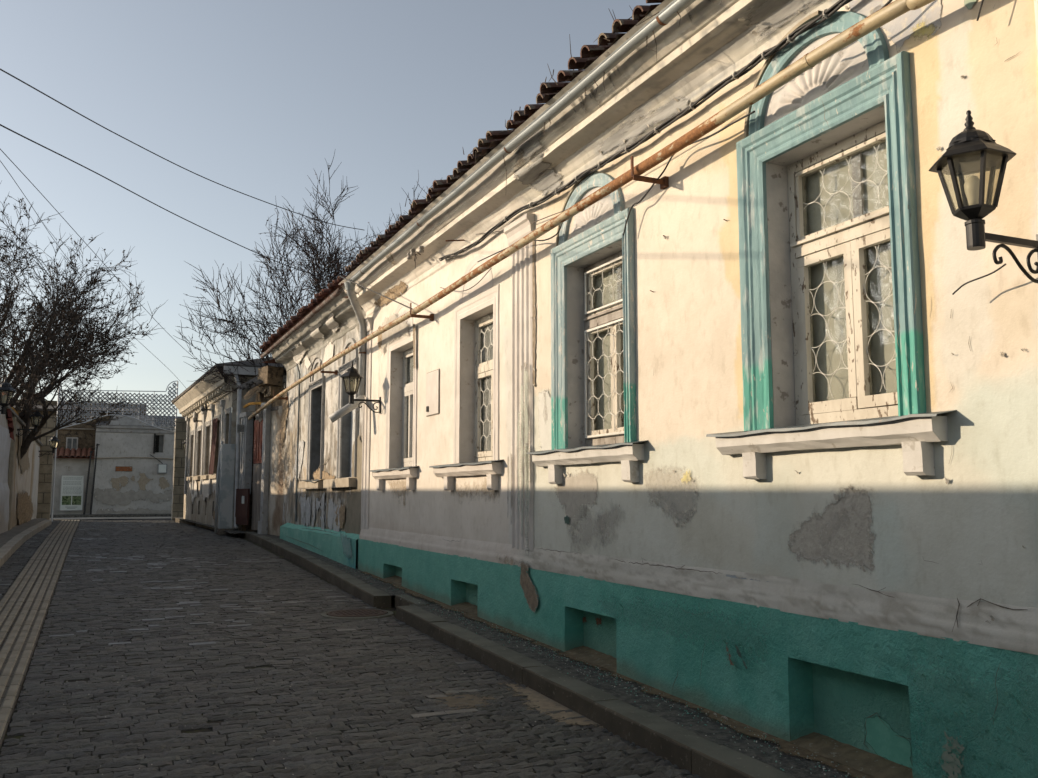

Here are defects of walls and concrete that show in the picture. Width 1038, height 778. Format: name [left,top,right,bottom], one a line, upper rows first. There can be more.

peeling [879,0,942,52]
flaking render [281,385,289,447]
peeling [94,466,172,506]
peeling [294,440,341,532]
peeling [555,470,597,535]
peeling [788,486,875,572]
flaking render [519,562,539,612]
crack [952,598,1027,631]
peeling [864,716,912,768]